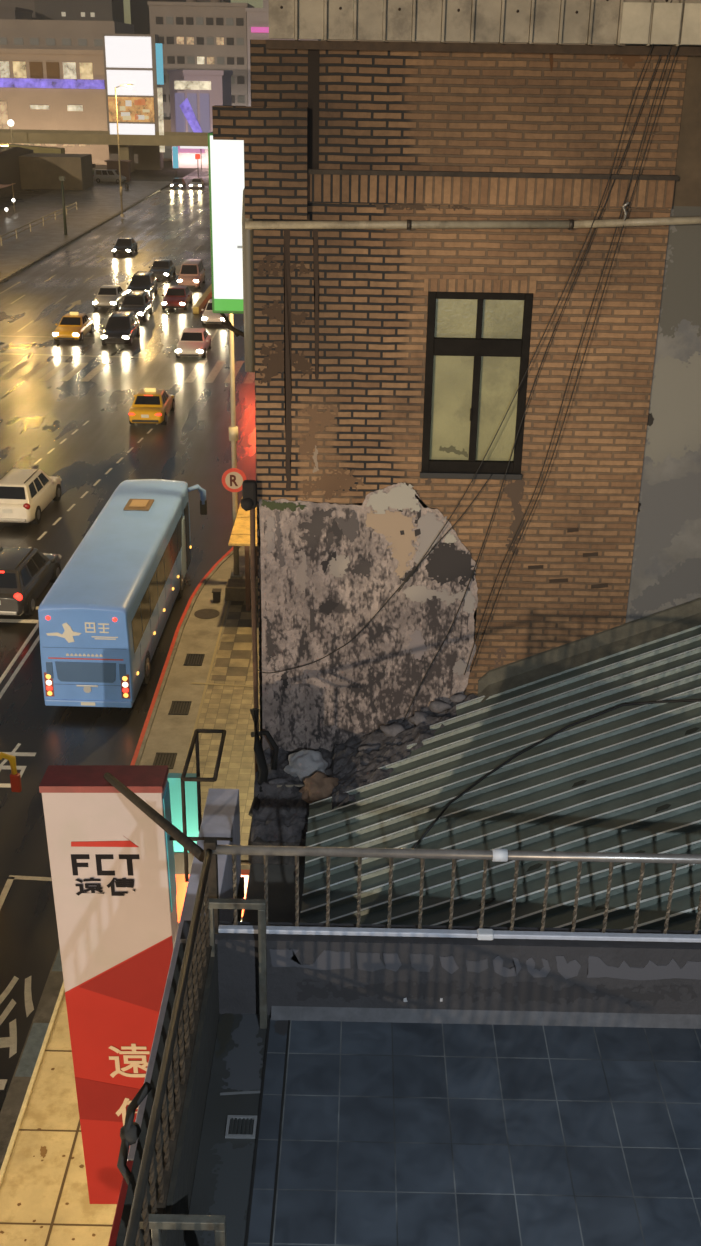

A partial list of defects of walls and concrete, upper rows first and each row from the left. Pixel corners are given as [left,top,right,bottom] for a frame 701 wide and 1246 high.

leakage [658,206,701,338]
flaking render [328,554,350,578]
leakage [264,507,476,751]
flaking render [366,510,476,613]
leakage [629,472,701,620]
peeling [269,949,701,980]